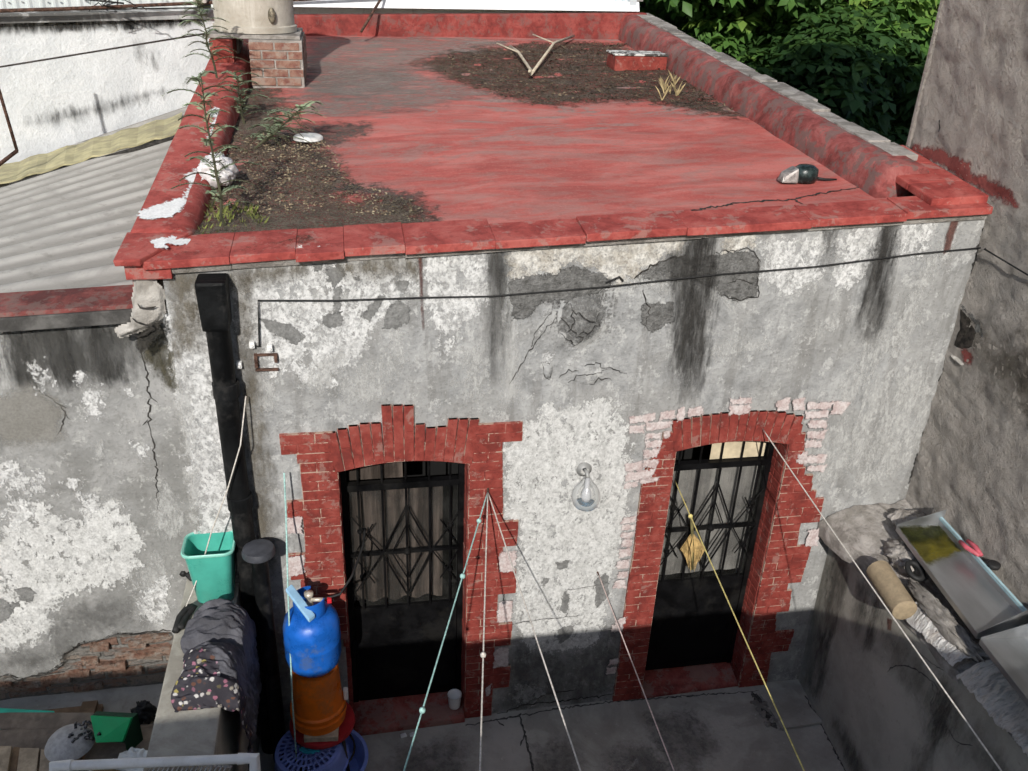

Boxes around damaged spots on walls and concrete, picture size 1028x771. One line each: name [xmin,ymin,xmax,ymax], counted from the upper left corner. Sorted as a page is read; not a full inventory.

water stain [0,273,199,422]
crack [509,314,555,384]
peeling [225,222,956,409]
water stain [670,237,716,382]
water stain [859,225,897,332]
crack [141,332,160,510]
peeling [728,397,754,417]
peeling [776,397,851,472]
peeling [0,458,176,701]
peeling [805,528,819,547]
peeling [492,647,509,669]